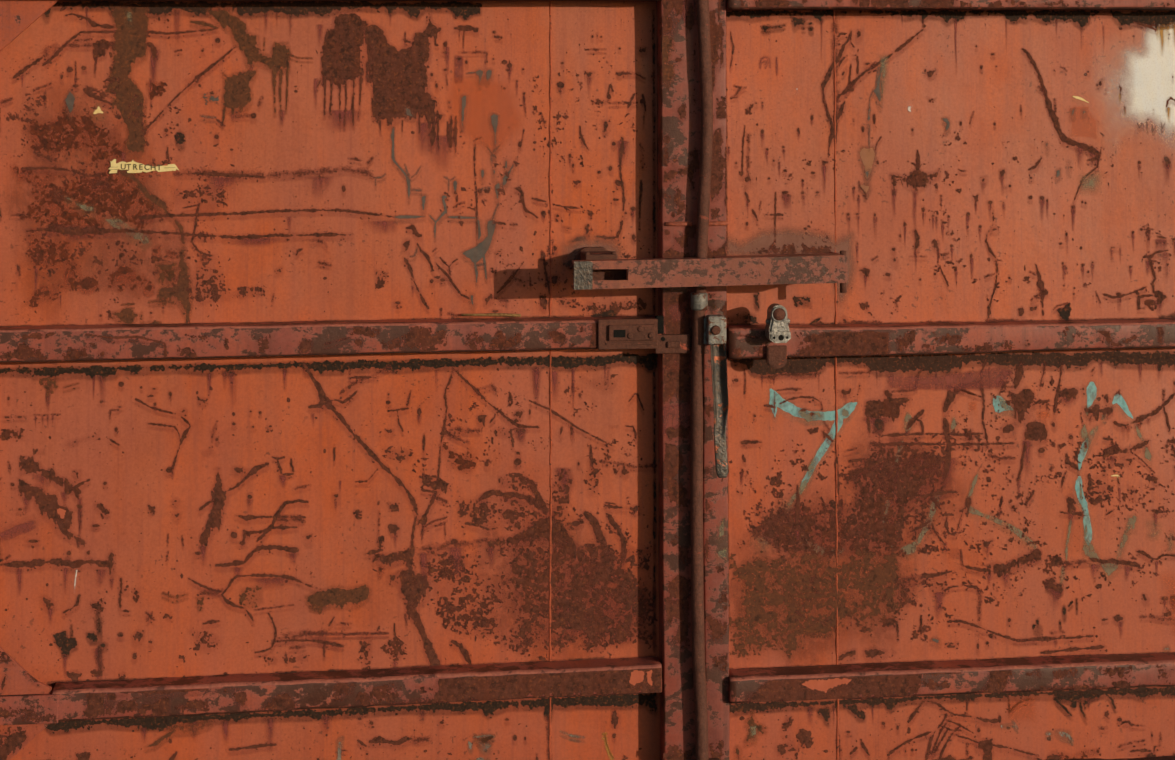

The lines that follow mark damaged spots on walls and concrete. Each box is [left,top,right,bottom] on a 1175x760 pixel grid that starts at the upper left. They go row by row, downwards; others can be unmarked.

rust [0,332,55,361]
rust [0,376,82,442]
rust [663,150,1175,760]
rust [190,462,321,583]
rust [0,449,152,682]
rust [163,591,220,667]
rust [229,585,262,608]
rust [256,639,310,673]
rust [83,674,210,719]